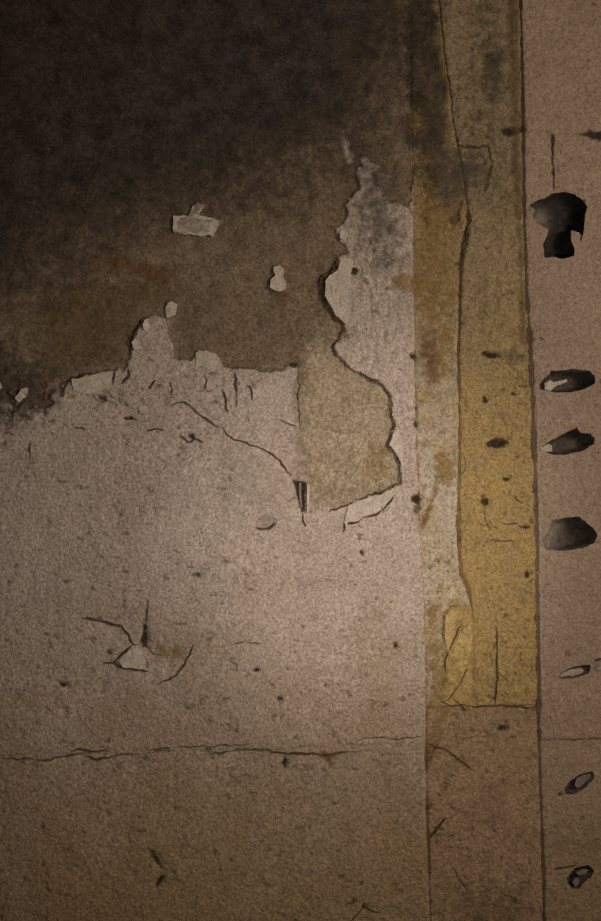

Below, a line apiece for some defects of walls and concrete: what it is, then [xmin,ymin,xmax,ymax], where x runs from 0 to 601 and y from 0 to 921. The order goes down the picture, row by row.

water stain [408,0,495,199]
spalling [530,192,587,259]
flaking render [0,0,412,527]
water stain [0,349,58,426]
crack [171,388,229,428]
spalling [539,369,595,393]
spalling [520,407,597,697]
crack [440,627,536,711]
crack [3,736,482,771]
spalling [559,772,595,796]
spalling [554,865,594,889]